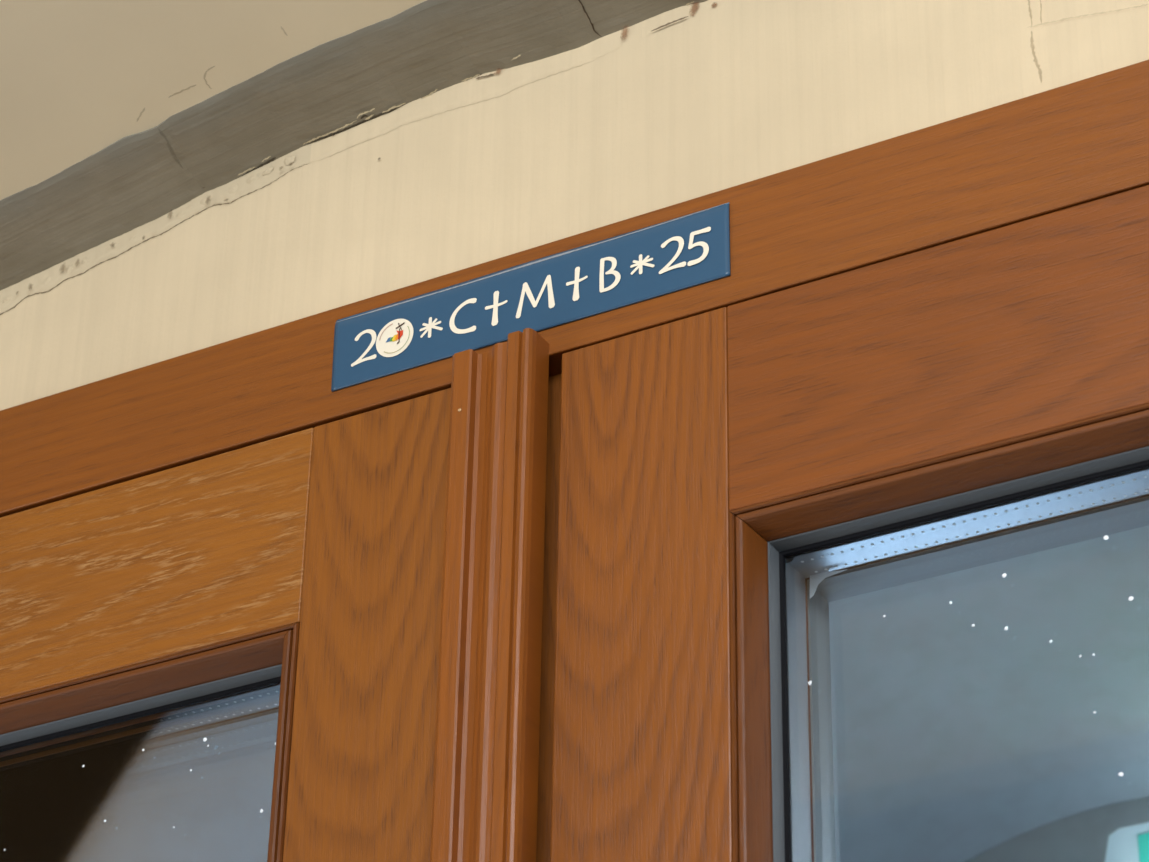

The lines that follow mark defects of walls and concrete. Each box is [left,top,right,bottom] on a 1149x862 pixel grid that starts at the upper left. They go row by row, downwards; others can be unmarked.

crack [578,0,600,36]
peeling [0,103,408,315]